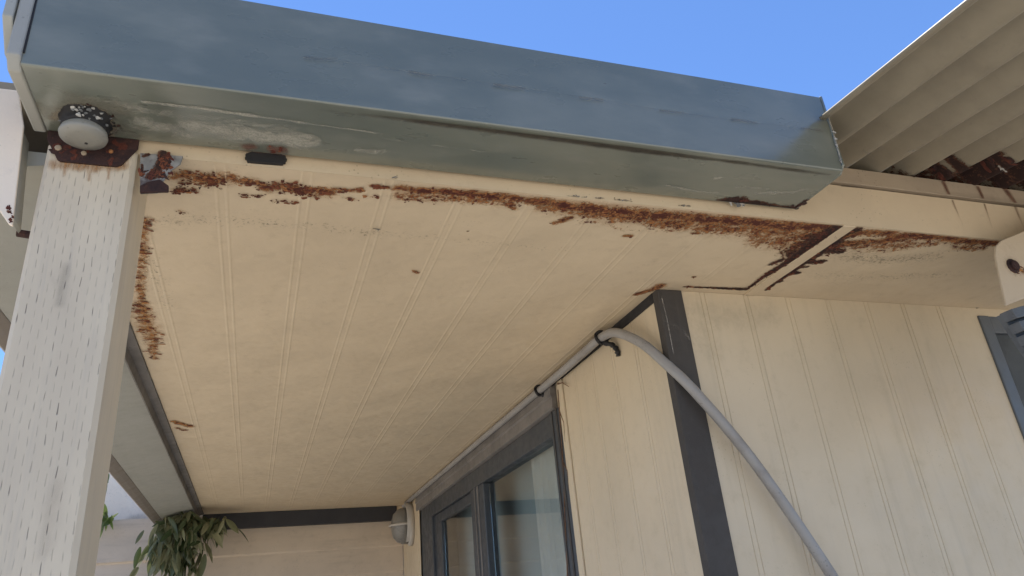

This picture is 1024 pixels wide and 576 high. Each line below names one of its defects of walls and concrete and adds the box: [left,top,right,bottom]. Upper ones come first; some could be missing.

corrosion [48,139,130,173]
corrosion [131,218,165,359]
corrosion [138,150,999,291]
corrosion [881,151,1024,208]